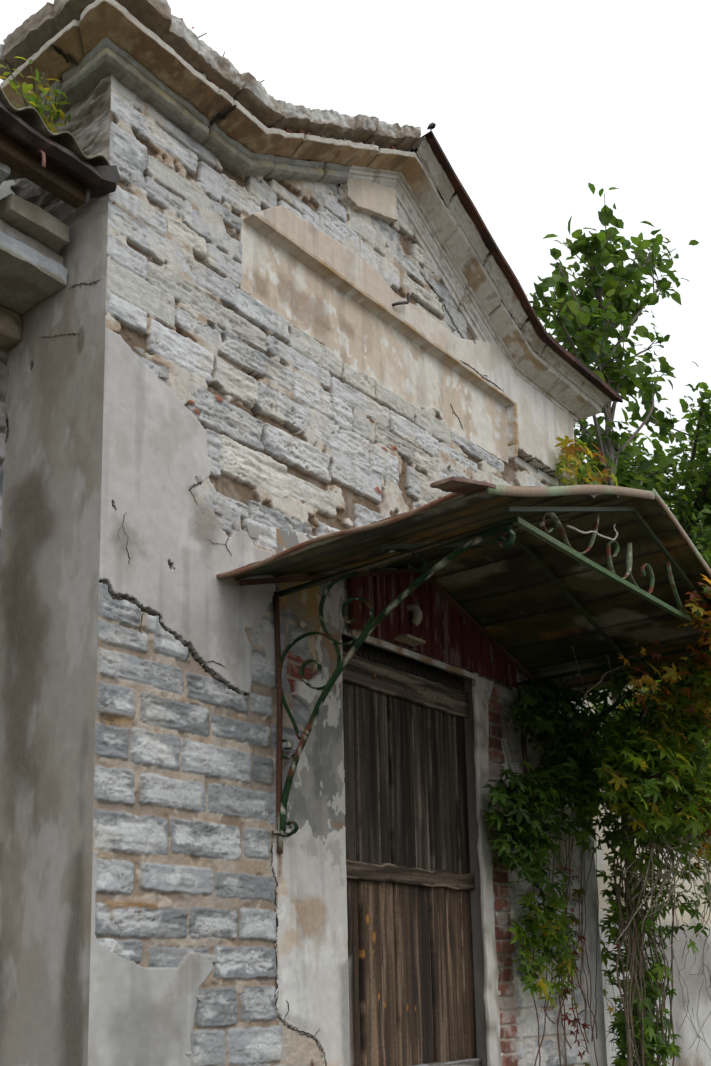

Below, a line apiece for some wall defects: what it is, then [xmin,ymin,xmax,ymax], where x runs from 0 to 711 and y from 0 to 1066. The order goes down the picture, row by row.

spalling [105,74,572,556]
crack [112,500,130,563]
crack [99,579,250,696]
spalling [93,573,326,1066]
crack [270,845,327,1066]